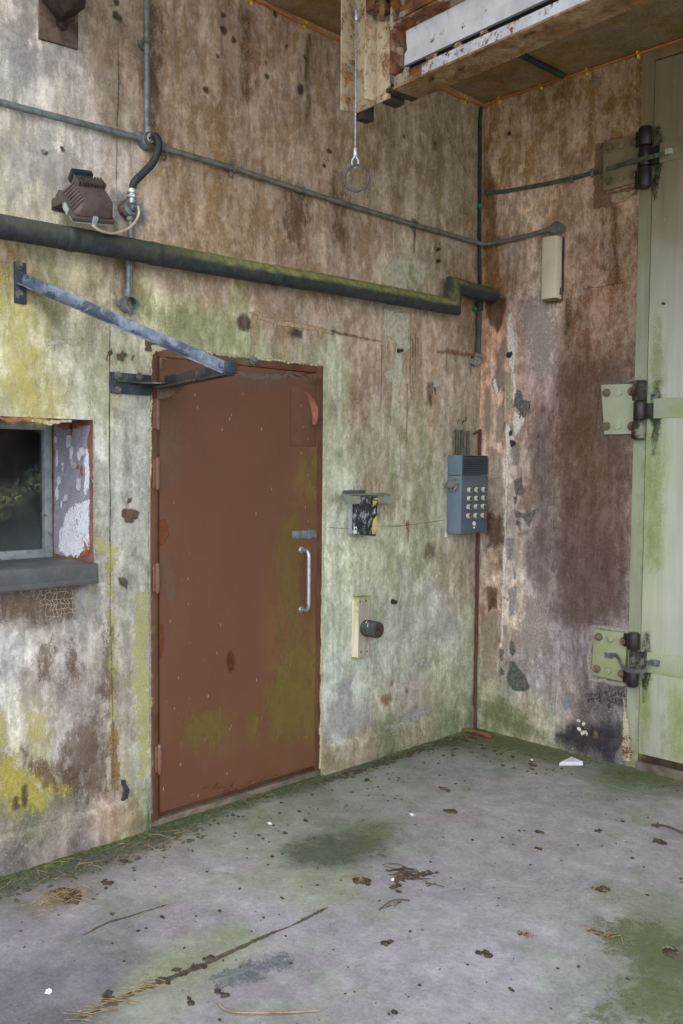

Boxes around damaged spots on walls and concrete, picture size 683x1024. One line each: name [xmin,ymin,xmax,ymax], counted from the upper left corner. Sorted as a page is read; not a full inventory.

spalling [513,389,531,419]
peeling [0,416,96,558]
spalling [504,477,538,616]
damp [38,638,84,681]
damp [99,627,115,701]
spalling [499,640,530,691]
damp [23,713,110,805]
damp [556,725,620,762]